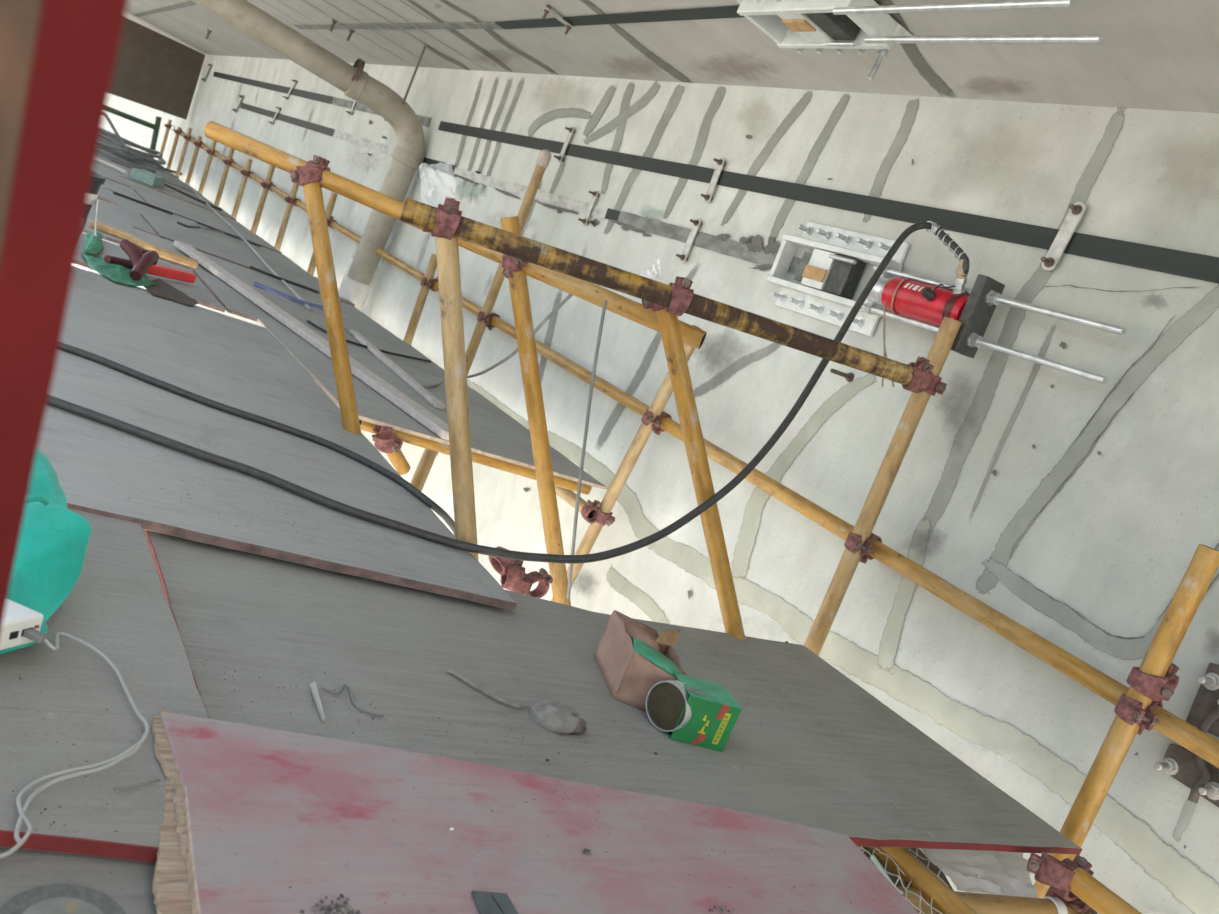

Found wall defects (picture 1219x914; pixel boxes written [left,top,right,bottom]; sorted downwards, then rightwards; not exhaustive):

crack [467,92,1219,914]